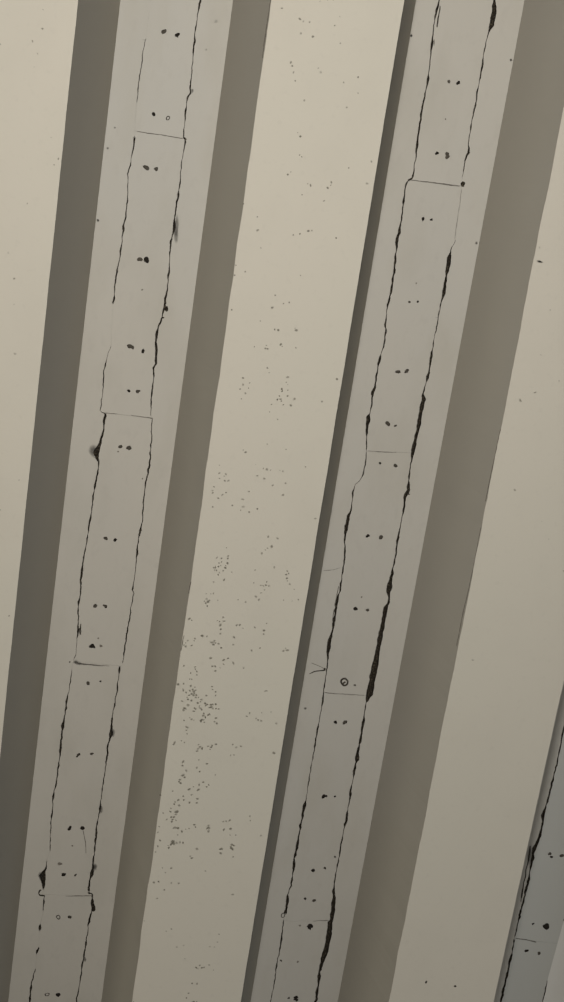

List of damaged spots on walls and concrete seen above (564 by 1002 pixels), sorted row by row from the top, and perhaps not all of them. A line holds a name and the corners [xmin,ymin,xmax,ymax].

crack [29,0,201,1002]
crack [270,0,497,1002]
crack [500,727,564,1002]